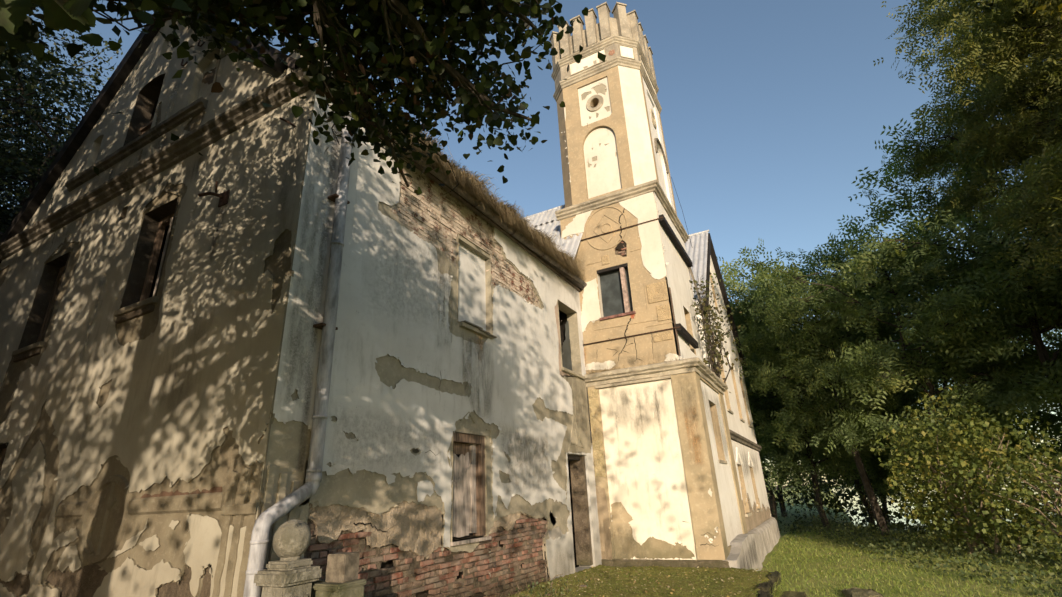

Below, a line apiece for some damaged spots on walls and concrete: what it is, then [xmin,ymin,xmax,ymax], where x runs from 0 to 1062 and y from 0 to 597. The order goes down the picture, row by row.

flaking render [0,237,82,425]
peeling [95,381,112,407]
flaking render [113,179,187,346]
flaking render [265,157,679,597]
crack [615,208,627,256]
crack [596,314,654,364]
flaking render [0,405,312,597]
flaking render [596,485,725,560]